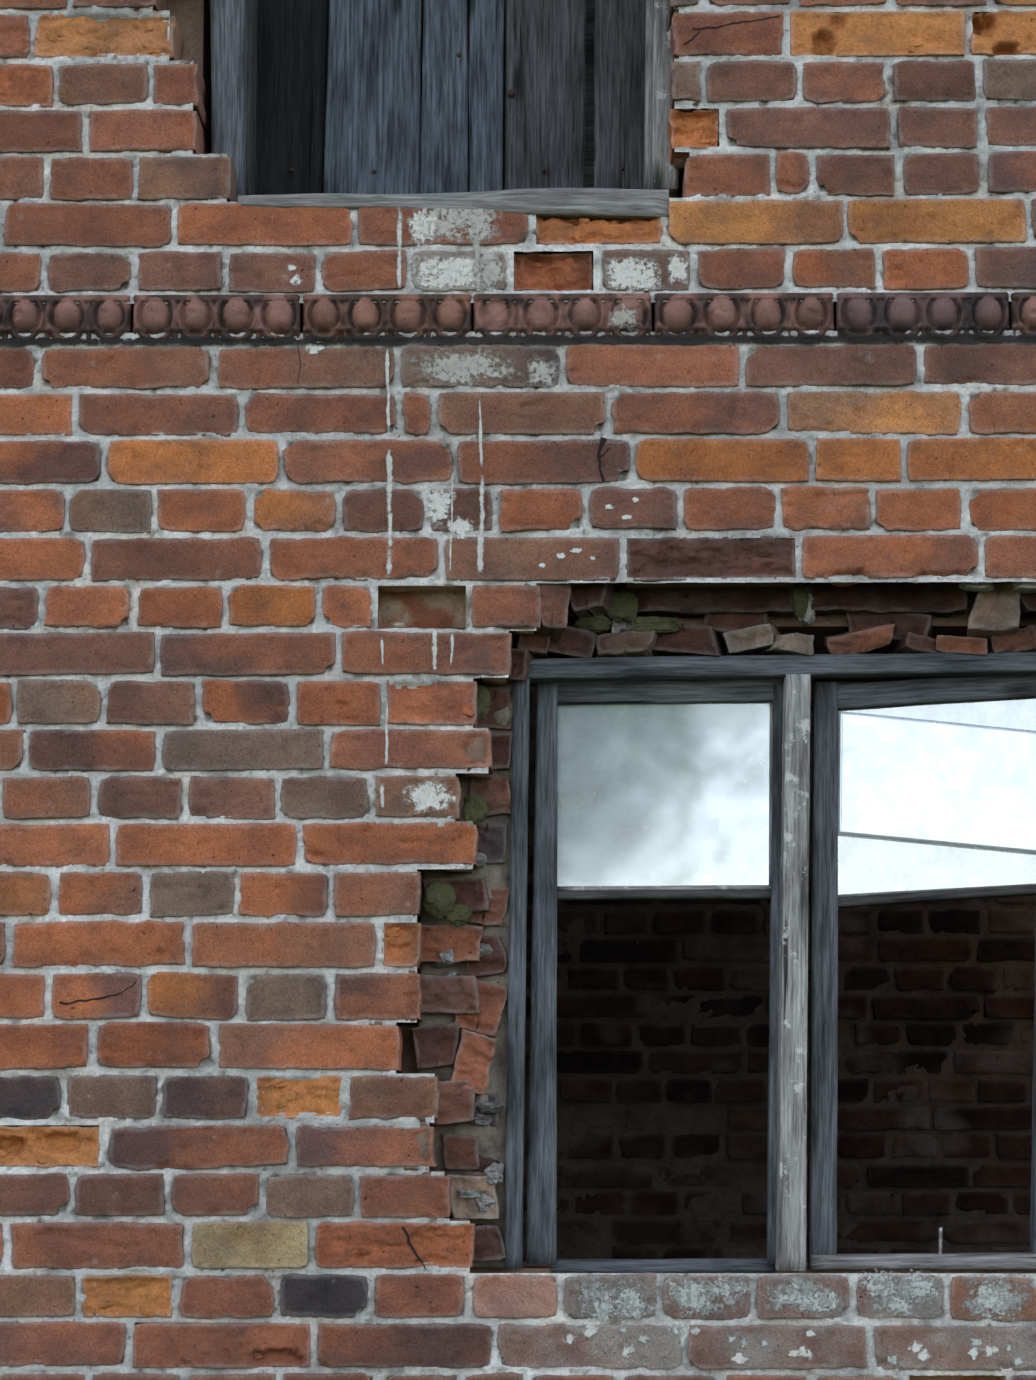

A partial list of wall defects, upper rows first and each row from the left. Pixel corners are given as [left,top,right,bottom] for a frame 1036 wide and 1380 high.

spalling [0,13,184,107]
spalling [790,10,1036,57]
water stain [397,208,506,291]
water stain [0,254,1036,572]
spalling [314,535,1036,1269]
spalling [256,1075,342,1119]
spalling [0,1125,101,1168]
spalling [81,1274,311,1368]